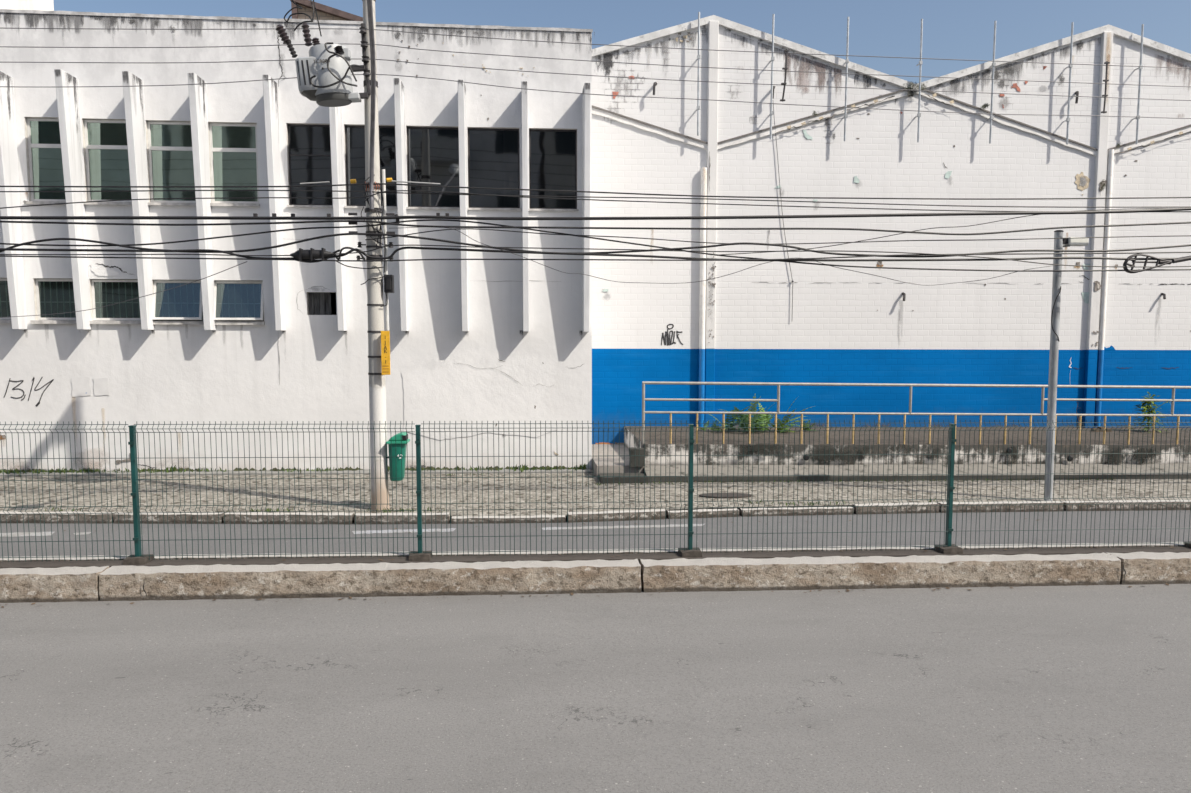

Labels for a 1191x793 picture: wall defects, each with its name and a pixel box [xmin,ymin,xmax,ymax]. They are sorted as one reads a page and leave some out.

leakage [388,25,495,41]
leakage [854,72,881,96]